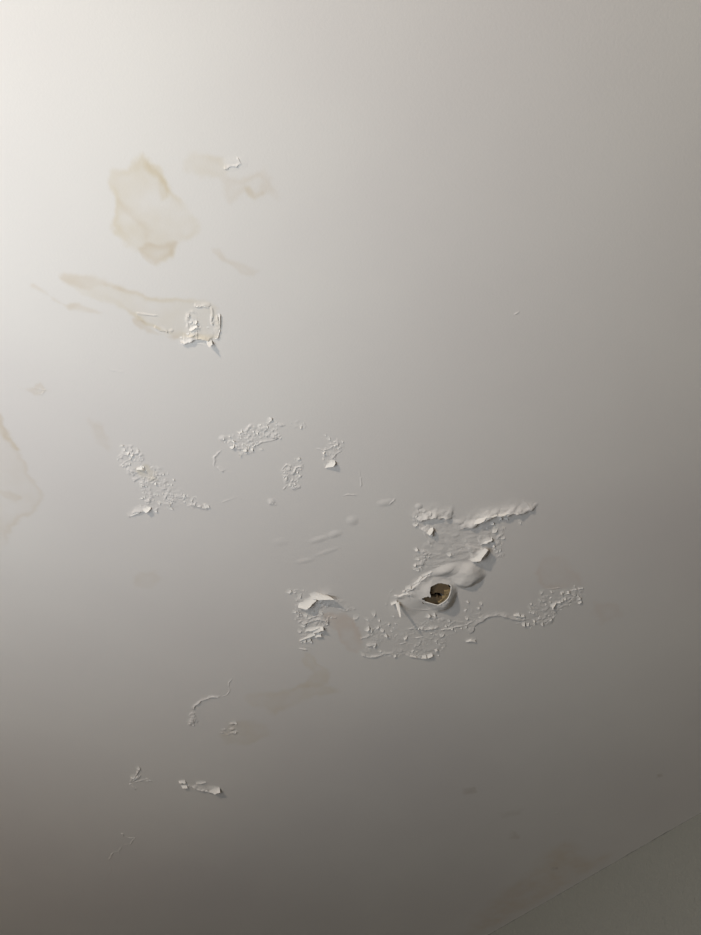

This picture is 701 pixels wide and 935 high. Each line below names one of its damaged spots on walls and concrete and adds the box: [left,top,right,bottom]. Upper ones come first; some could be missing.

damp [104,149,204,270]
damp [28,270,228,343]
peeling [135,301,221,348]
peeling [116,444,209,518]
peeling [212,417,307,474]
peeling [405,497,540,573]
peeling [285,582,586,660]
peeling [179,779,221,795]